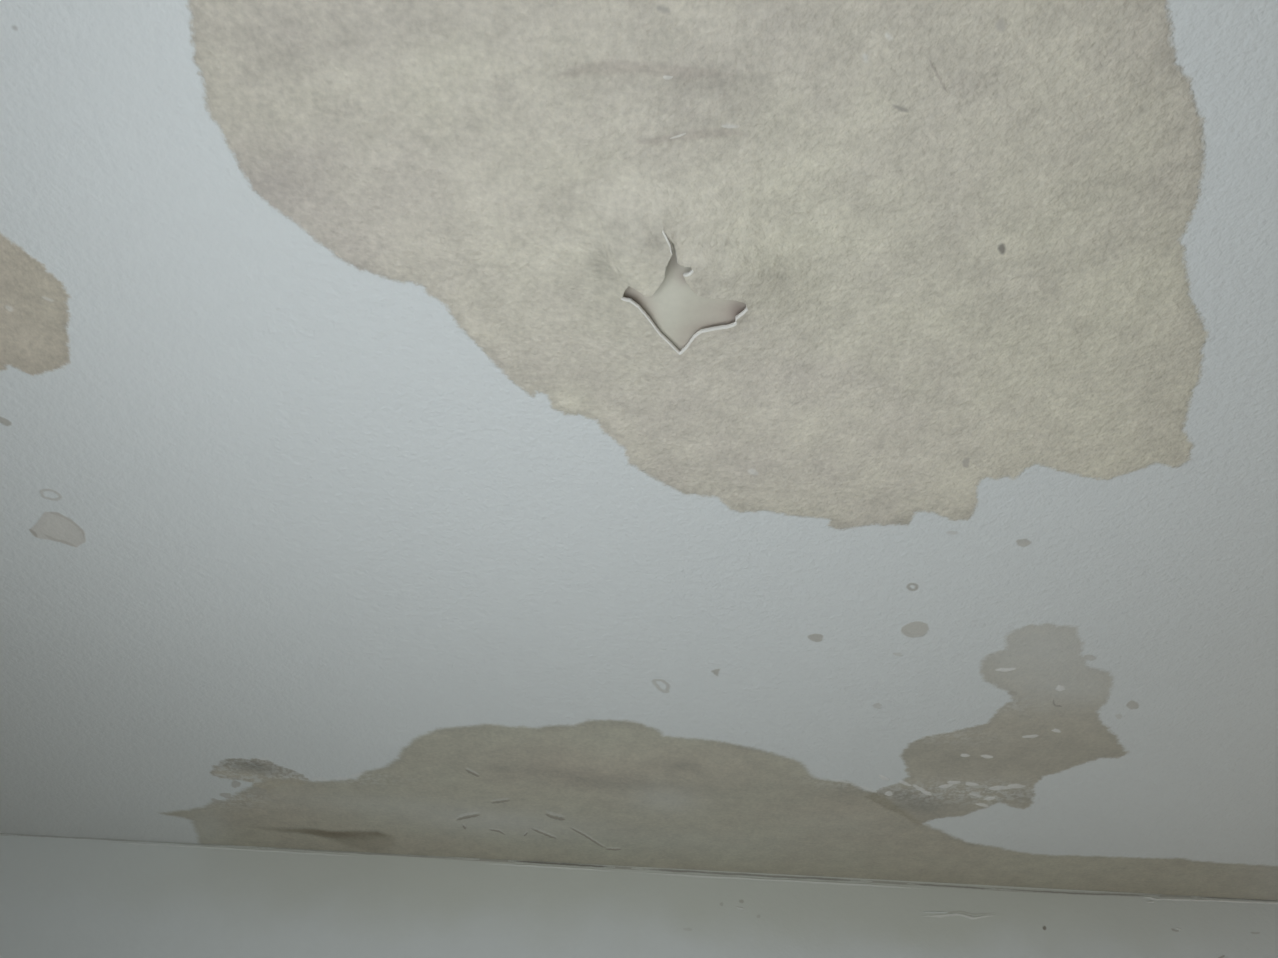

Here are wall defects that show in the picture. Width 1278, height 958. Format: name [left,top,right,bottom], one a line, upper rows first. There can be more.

leakage [0,225,80,382]
leakage [178,0,1218,536]
leakage [26,486,90,549]
leakage [150,618,1278,901]